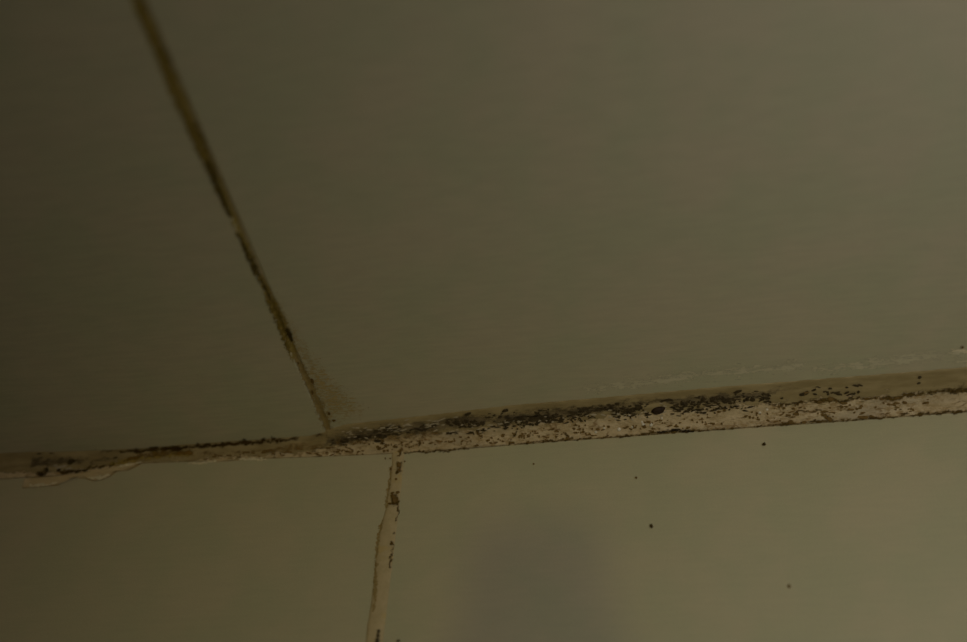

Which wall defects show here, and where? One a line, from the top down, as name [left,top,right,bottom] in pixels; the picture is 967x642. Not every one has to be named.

water stain [131,0,914,568]